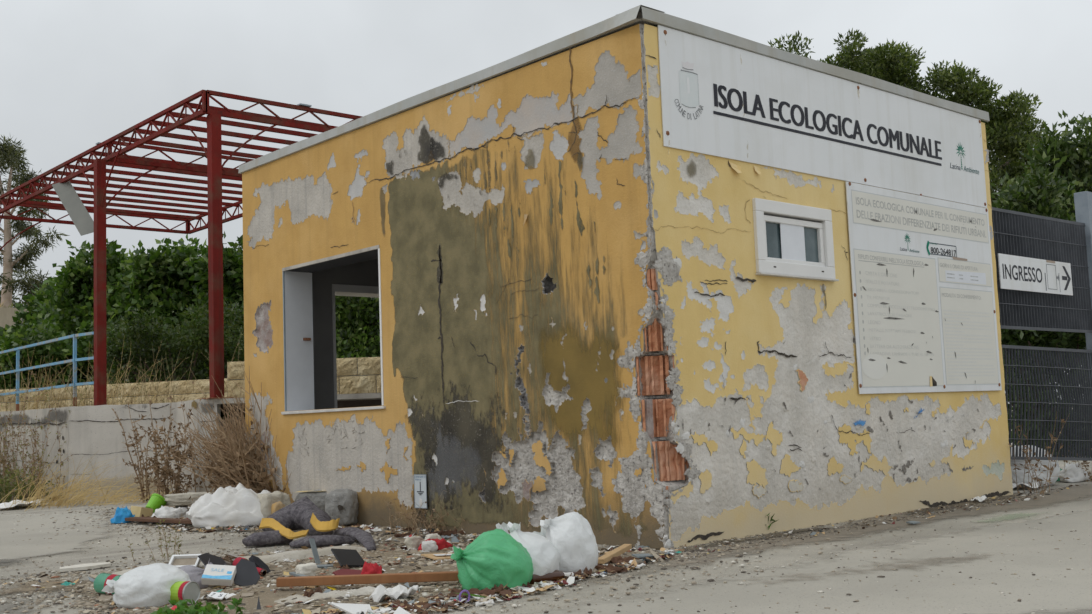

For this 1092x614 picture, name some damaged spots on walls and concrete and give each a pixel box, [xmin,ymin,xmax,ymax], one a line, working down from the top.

peeling [247,152,336,249]
peeling [347,149,370,226]
crack [332,48,639,218]
damp [484,139,509,192]
damp [525,149,534,169]
damp [544,161,595,236]
spalling [252,300,273,358]
crack [400,246,496,433]
damp [587,256,605,303]
peeling [382,27,1005,568]
peeling [245,391,423,511]